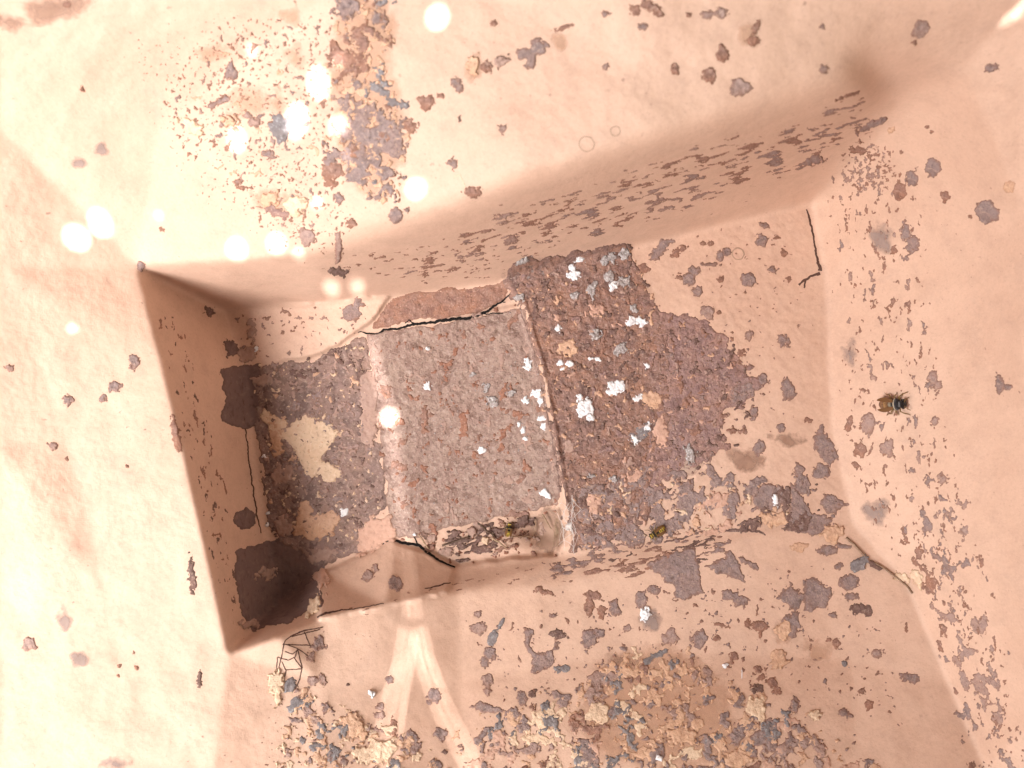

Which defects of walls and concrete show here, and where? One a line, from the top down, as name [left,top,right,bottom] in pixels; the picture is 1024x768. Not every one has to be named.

peeling [261,189,309,217]
crack [798,209,822,288]
crack [358,294,567,500]
corrosion [207,90,1024,768]
crack [242,383,262,533]
crack [383,537,455,589]
peeling [769,619,791,670]
peeling [267,668,285,709]
peeling [585,699,609,725]
peeling [745,693,766,723]
peeling [339,711,398,766]
peeling [716,748,753,768]